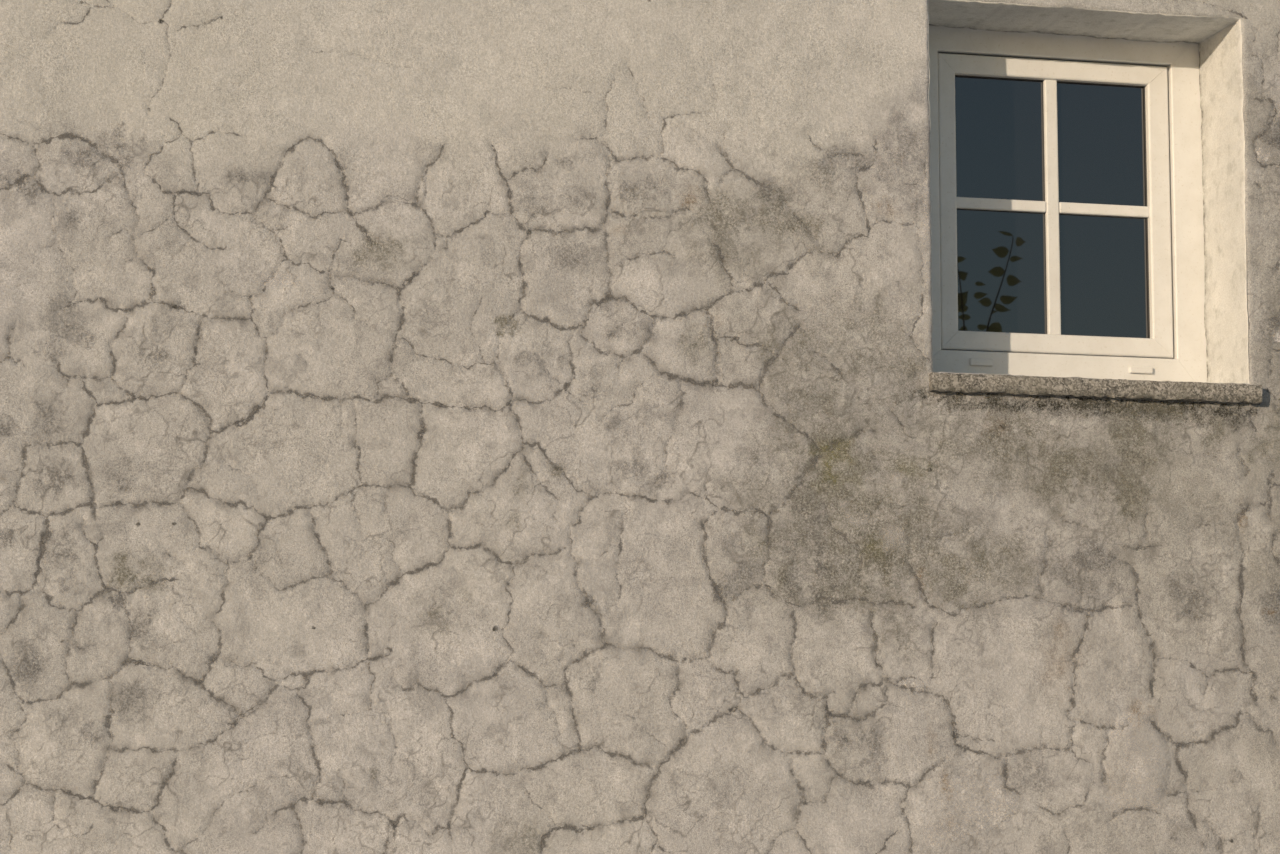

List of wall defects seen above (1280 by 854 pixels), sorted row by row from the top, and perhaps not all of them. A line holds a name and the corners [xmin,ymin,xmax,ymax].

crack [0,82,378,312]
crack [1236,12,1279,167]
crack [3,120,1114,854]
damp [794,479,892,574]
crack [1112,419,1280,826]